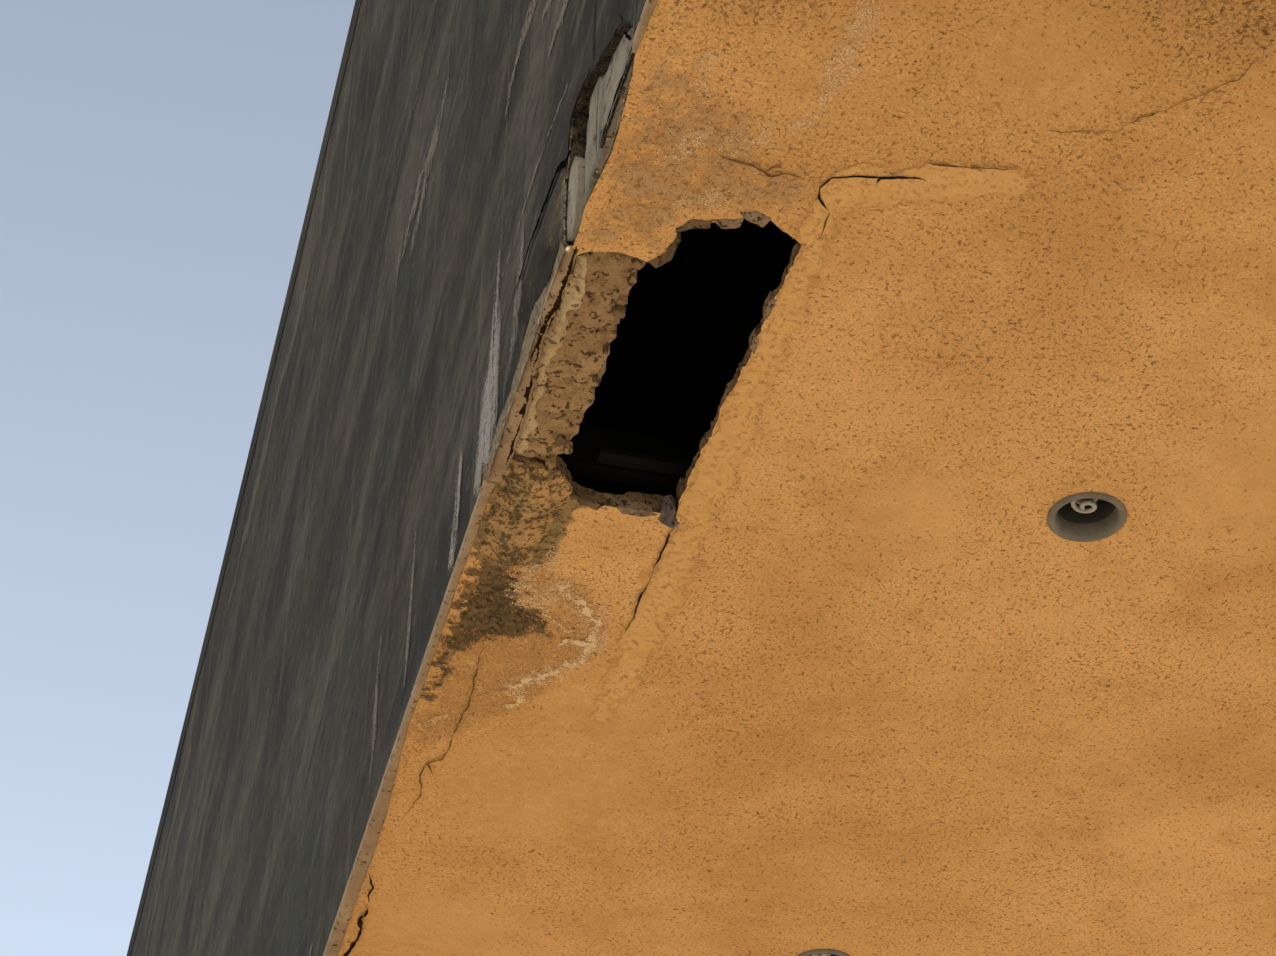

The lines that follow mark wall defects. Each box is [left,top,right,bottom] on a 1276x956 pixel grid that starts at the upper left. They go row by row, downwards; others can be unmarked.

crack [718,153,1022,238]
spalling [486,21,798,483]
leakage [403,207,618,748]
spalling [570,476,676,517]
crack [621,526,680,637]
crack [401,633,486,821]
crack [338,874,374,956]